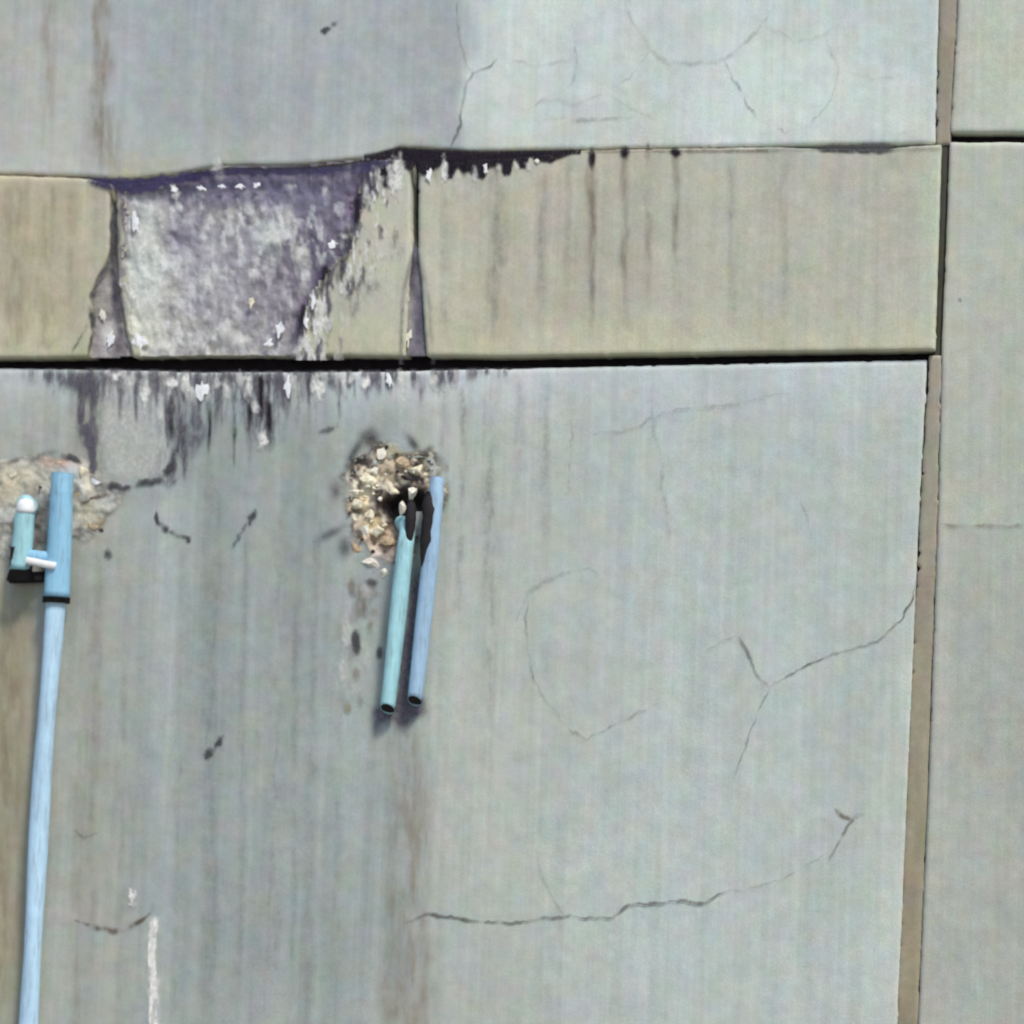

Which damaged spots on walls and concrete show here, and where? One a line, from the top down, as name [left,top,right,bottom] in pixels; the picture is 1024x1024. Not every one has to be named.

leakage [589,146,629,165]
leakage [818,143,894,153]
spalling [0,147,581,558]
spalling [341,431,448,585]
peeling [352,630,360,653]
crack [421,893,722,924]